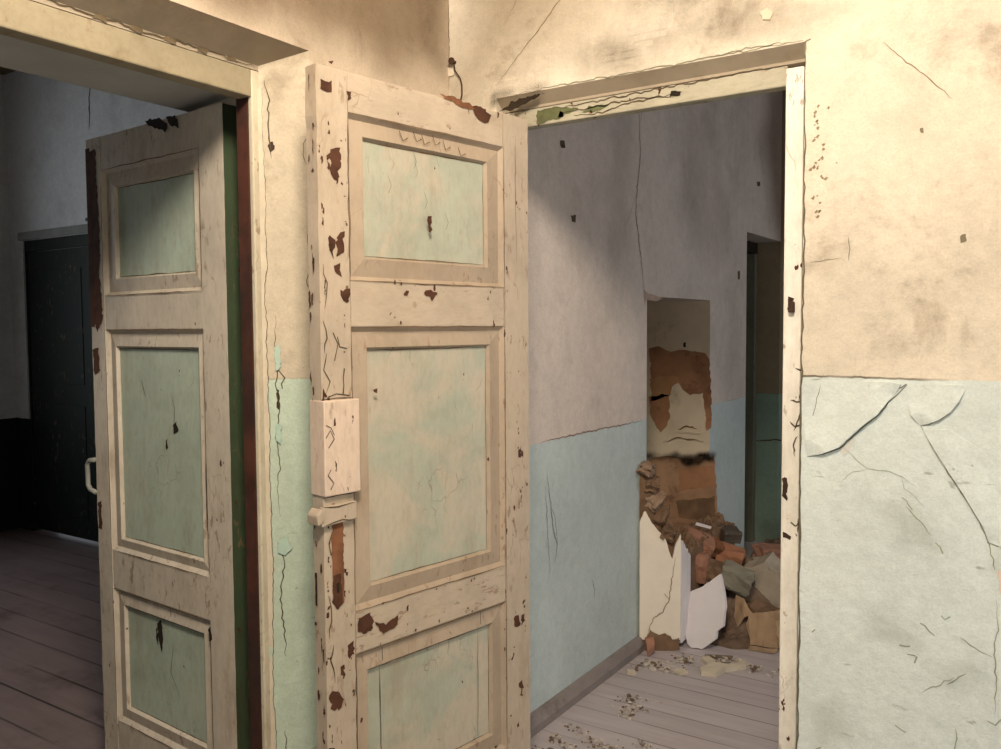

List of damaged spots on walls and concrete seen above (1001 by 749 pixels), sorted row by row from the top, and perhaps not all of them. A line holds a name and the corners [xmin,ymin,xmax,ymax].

peeling [440,38,811,125]
crack [543,54,920,749]
spalling [649,456,717,520]
crack [921,404,999,569]
spalling [644,630,680,651]
crack [992,602,1000,714]